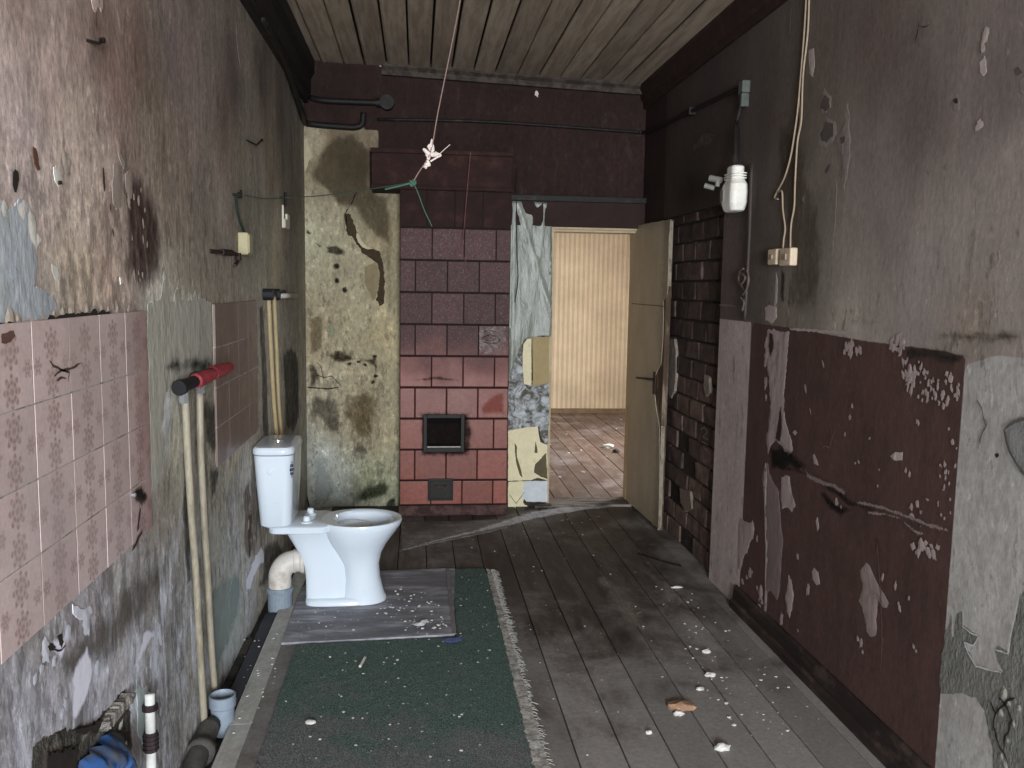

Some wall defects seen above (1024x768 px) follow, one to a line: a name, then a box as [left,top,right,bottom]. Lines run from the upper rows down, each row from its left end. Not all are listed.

peeling [0,169,130,344]
leakage [129,182,159,280]
leakage [315,137,386,236]
peeling [843,338,862,359]
peeling [889,333,960,410]
leakage [360,484,387,500]
peeling [738,274,820,625]
spalling [807,452,956,560]
spalling [995,418,1024,475]
peeling [857,563,910,654]
spalling [32,604,167,768]
spalling [939,593,1024,768]